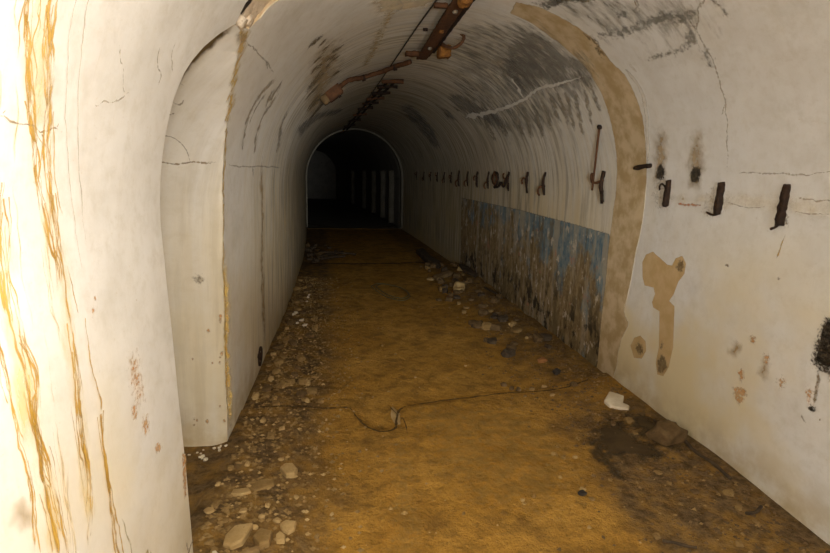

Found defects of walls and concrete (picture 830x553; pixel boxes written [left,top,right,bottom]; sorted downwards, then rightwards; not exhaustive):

spalling [236,0,279,31]
water stain [442,25,600,140]
crack [466,76,583,119]
water stain [587,2,695,58]
crack [690,2,728,151]
rust [18,0,93,507]
rust [0,185,68,551]
flaking render [631,336,646,358]
flaking render [642,252,686,376]
spalling [806,318,830,420]
rust [87,336,124,553]